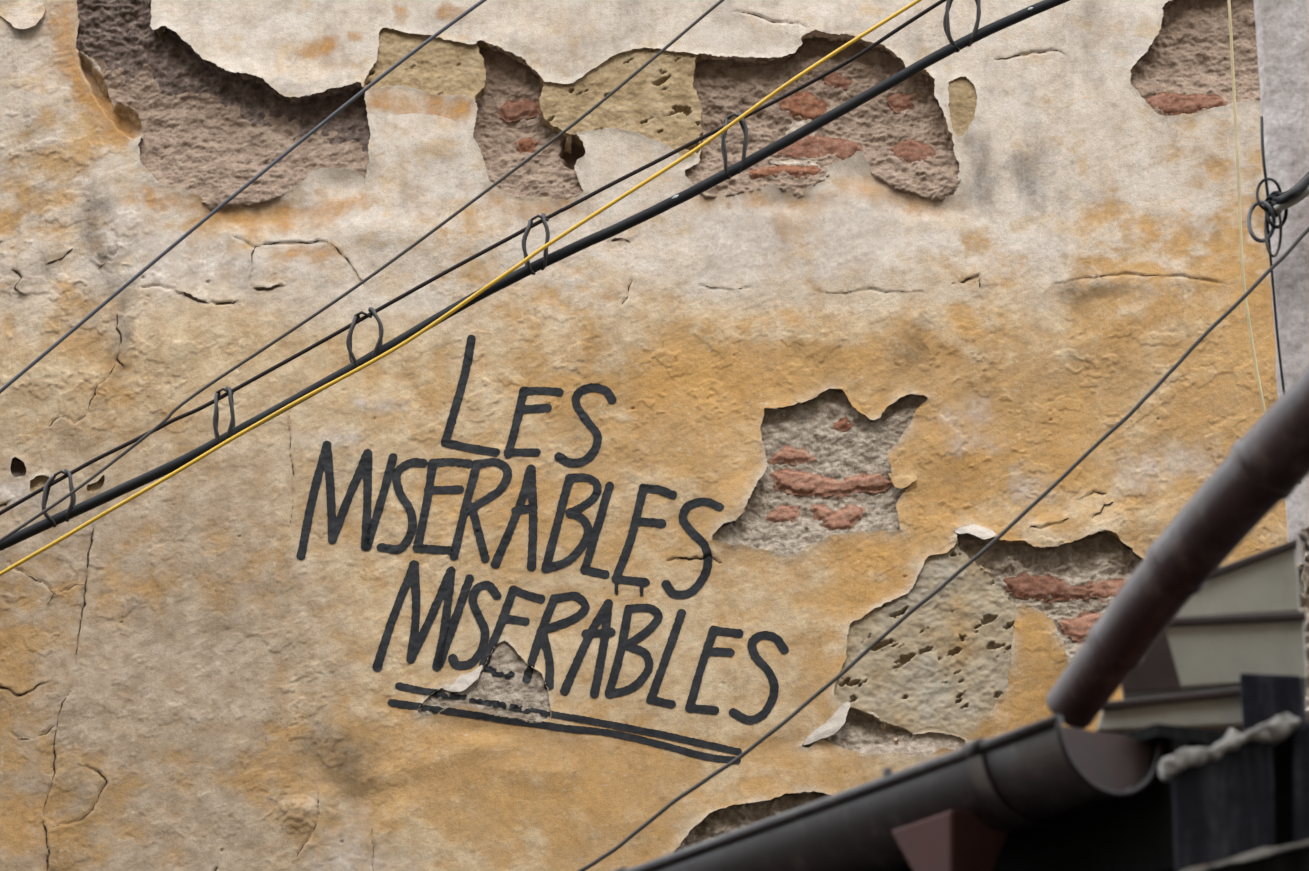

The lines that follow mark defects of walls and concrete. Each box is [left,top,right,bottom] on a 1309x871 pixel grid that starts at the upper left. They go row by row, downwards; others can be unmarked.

flaking render [0,0,45,30]
flaking render [76,0,977,212]
crack [997,50,1064,60]
flaking render [1130,0,1260,116]
crack [142,235,358,305]
crack [49,314,123,426]
flaking render [712,389,928,554]
flaking render [418,641,551,722]
flaking render [802,524,1143,756]
flaking render [674,791,831,852]